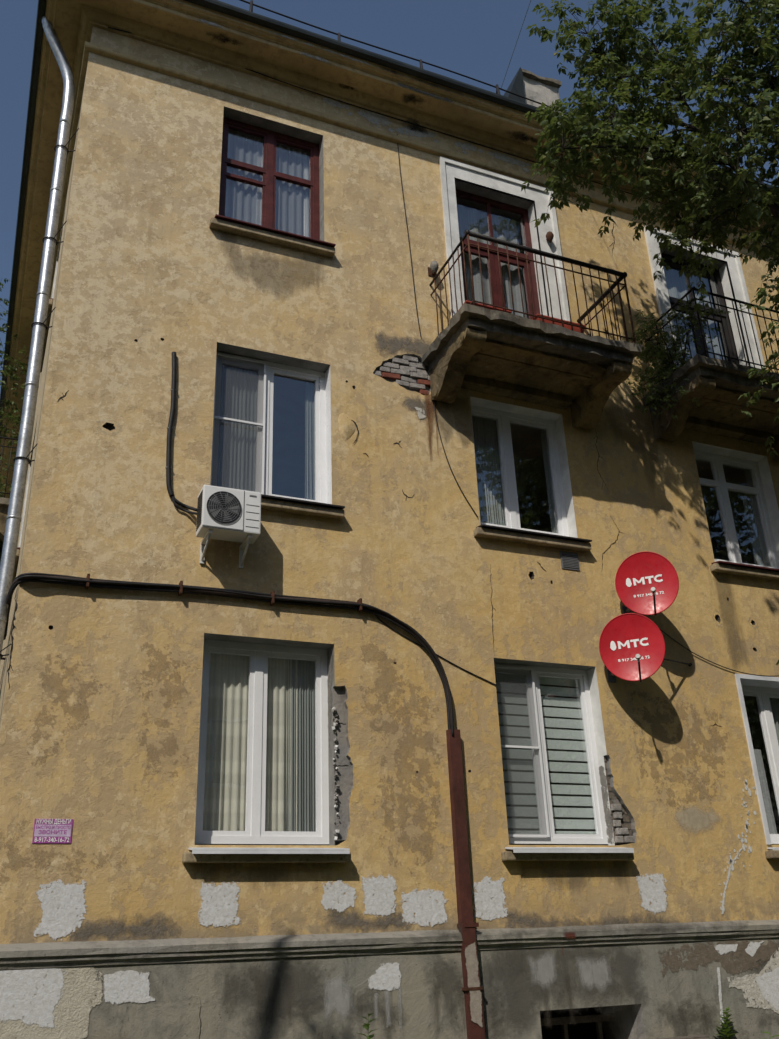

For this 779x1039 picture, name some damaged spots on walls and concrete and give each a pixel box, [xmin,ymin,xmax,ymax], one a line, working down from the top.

flaking render [373,334,431,419]
flaking render [327,654,353,841]
flaking render [599,755,637,843]
peeling [0,966,103,1039]
peeling [659,938,779,1014]